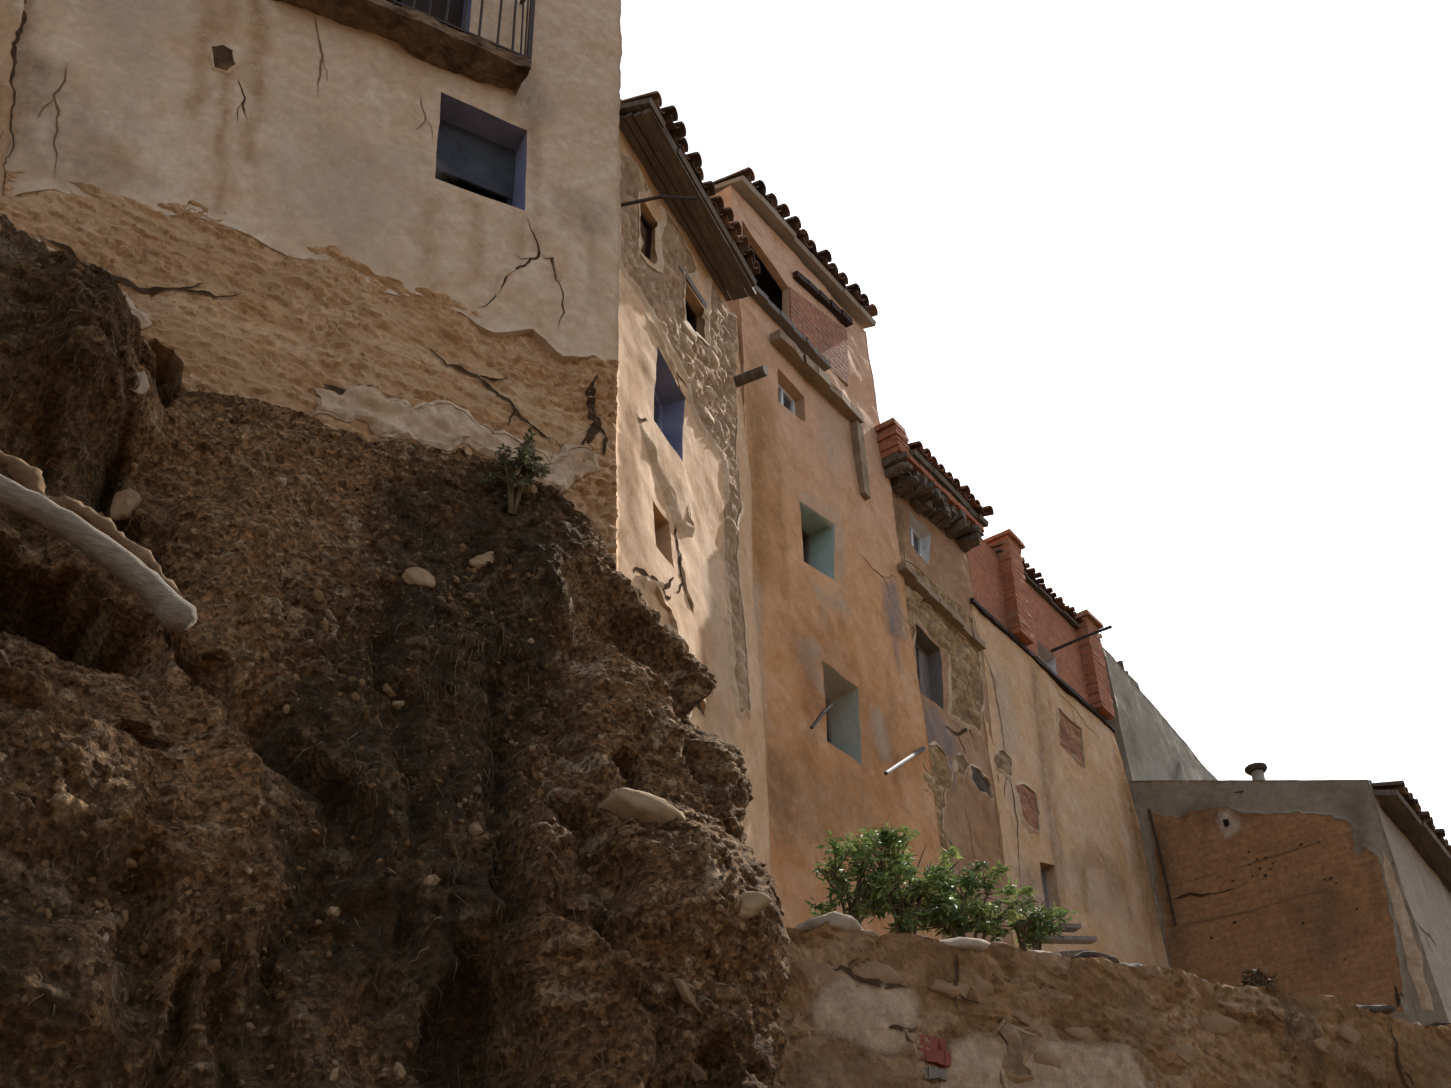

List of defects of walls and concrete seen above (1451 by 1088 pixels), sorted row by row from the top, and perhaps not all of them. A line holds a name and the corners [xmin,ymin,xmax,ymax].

crack [3,0,68,195]
crack [36,235,80,261]
spalling [122,291,152,329]
crack [112,275,240,298]
crack [477,218,565,327]
spalling [311,385,601,494]
crack [429,347,695,613]
spalling [619,154,752,721]
spalling [896,524,985,736]
spalling [922,740,1040,894]
peeling [940,1019,1158,1088]
crack [1391,984,1416,1088]